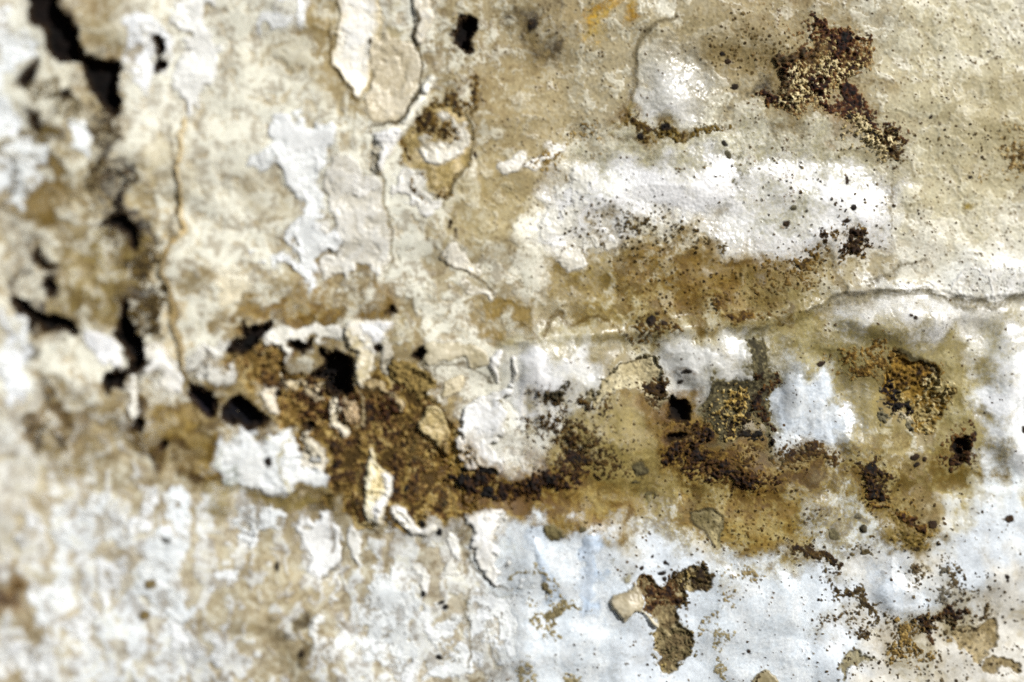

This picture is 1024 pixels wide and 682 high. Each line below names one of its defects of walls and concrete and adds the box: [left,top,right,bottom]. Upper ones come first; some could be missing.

peeling [0,5,50,211]
peeling [68,119,92,158]
peeling [122,0,224,117]
peeling [246,0,480,293]
peeling [0,306,33,407]
peeling [83,330,123,367]
leakage [357,265,397,320]
crack [814,262,1024,310]
flaking render [128,323,581,642]
leakage [420,220,1024,654]